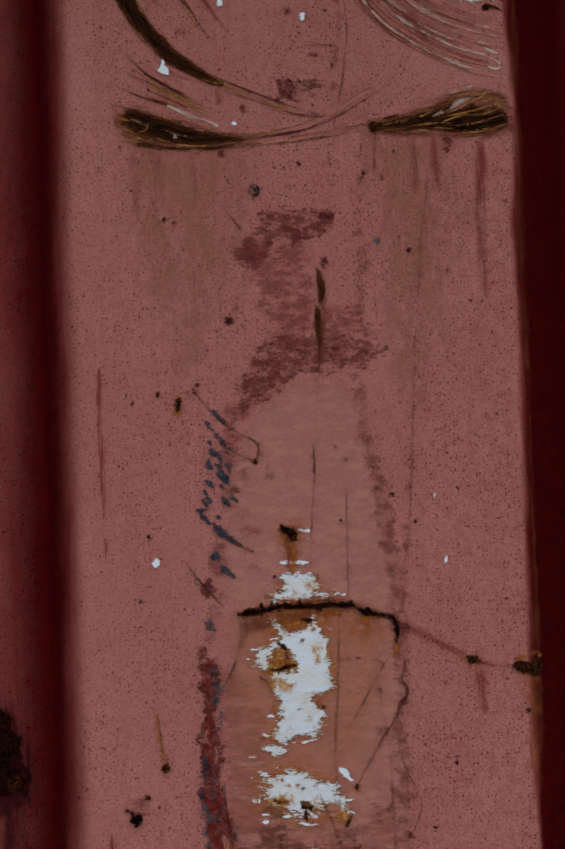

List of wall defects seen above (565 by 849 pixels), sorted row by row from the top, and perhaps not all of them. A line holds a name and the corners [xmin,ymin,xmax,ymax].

spalling [114,0,513,151]
corrosion [278,523,298,575]
corrosion [0,709,32,849]
peeling [192,653,240,849]
peeling [247,560,368,849]
corrosion [512,651,543,677]